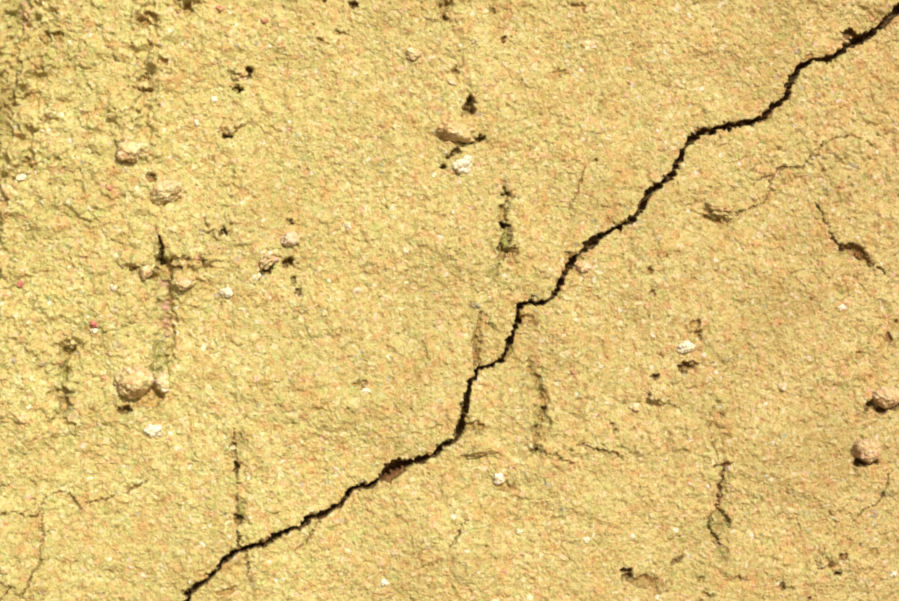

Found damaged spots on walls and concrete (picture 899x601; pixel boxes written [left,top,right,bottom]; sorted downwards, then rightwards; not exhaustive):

crack [155,229,166,264]
crack [180,3,899,601]